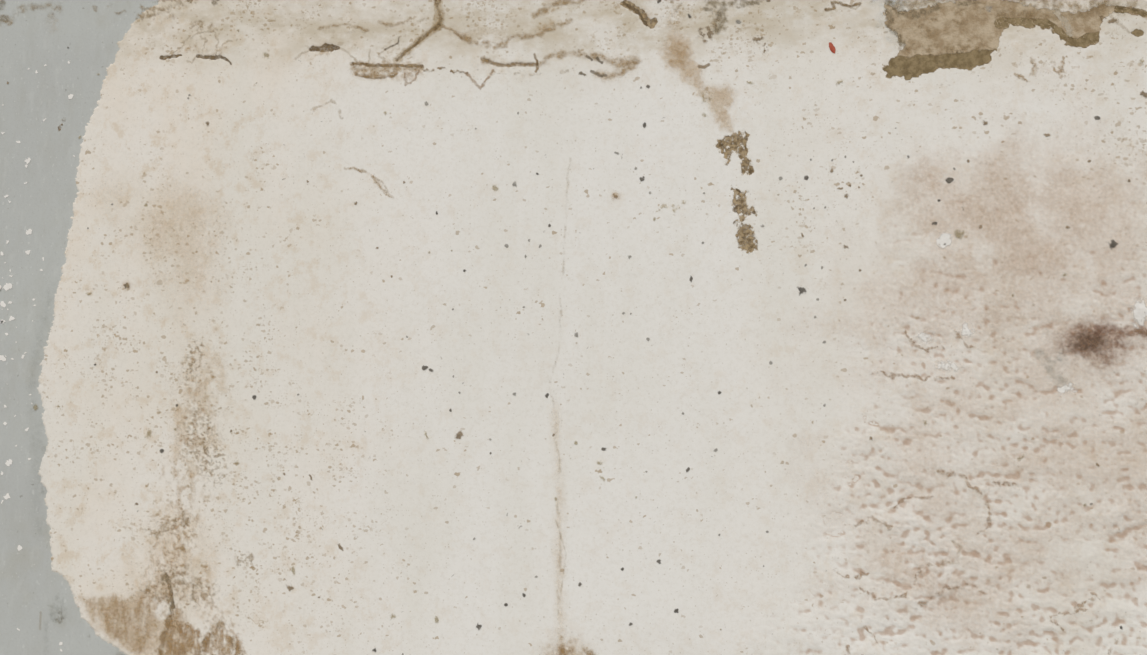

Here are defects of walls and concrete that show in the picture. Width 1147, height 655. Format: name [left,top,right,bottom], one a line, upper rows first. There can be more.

crack [357,0,444,61]
leakage [699,2,741,42]
flaking render [882,0,1147,80]
peeling [0,240,27,361]
leakage [159,573,240,655]